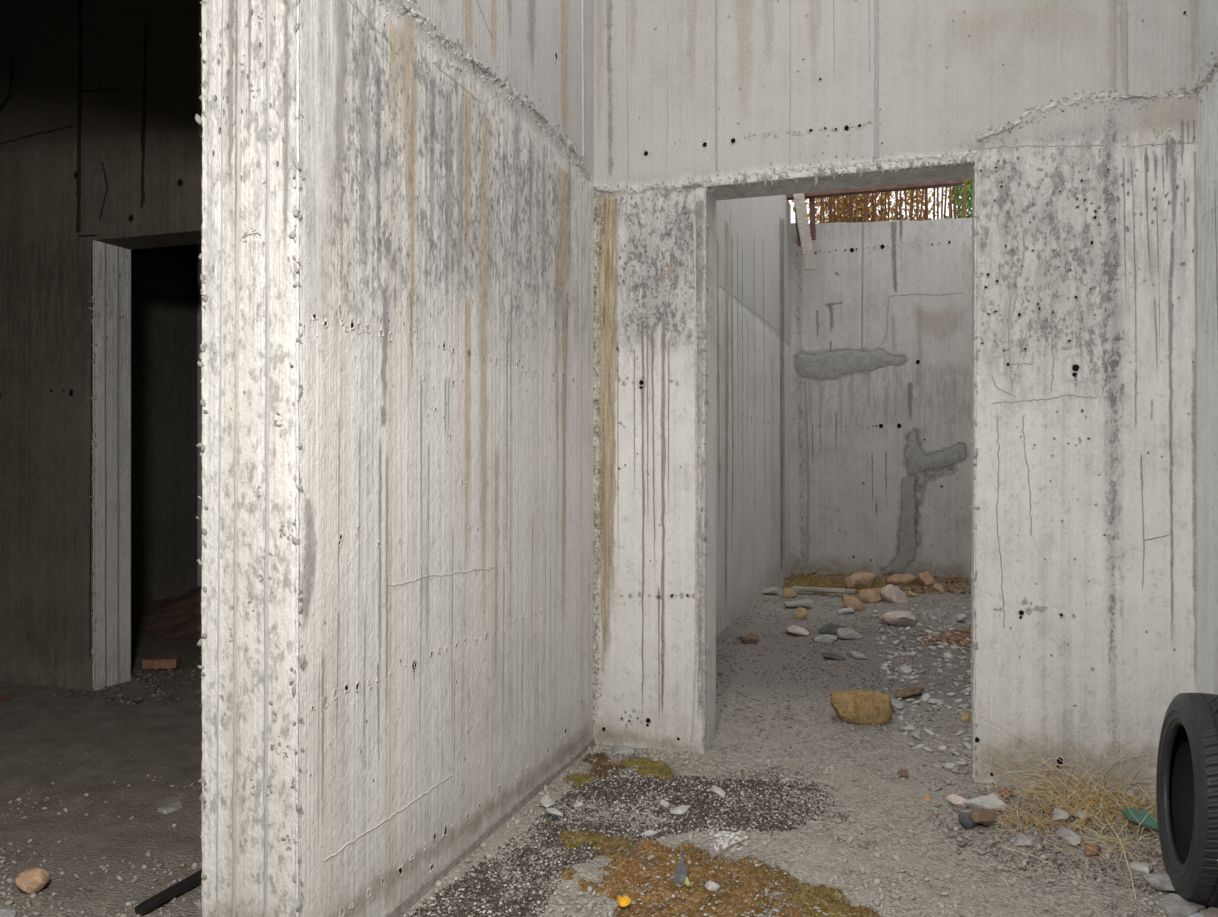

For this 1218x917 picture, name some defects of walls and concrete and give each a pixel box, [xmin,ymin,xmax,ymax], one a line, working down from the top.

crack [76,162,108,232]
water stain [228,0,251,230]
water stain [306,0,344,310]
water stain [360,27,381,233]
water stain [421,384,429,546]
water stain [364,448,388,733]